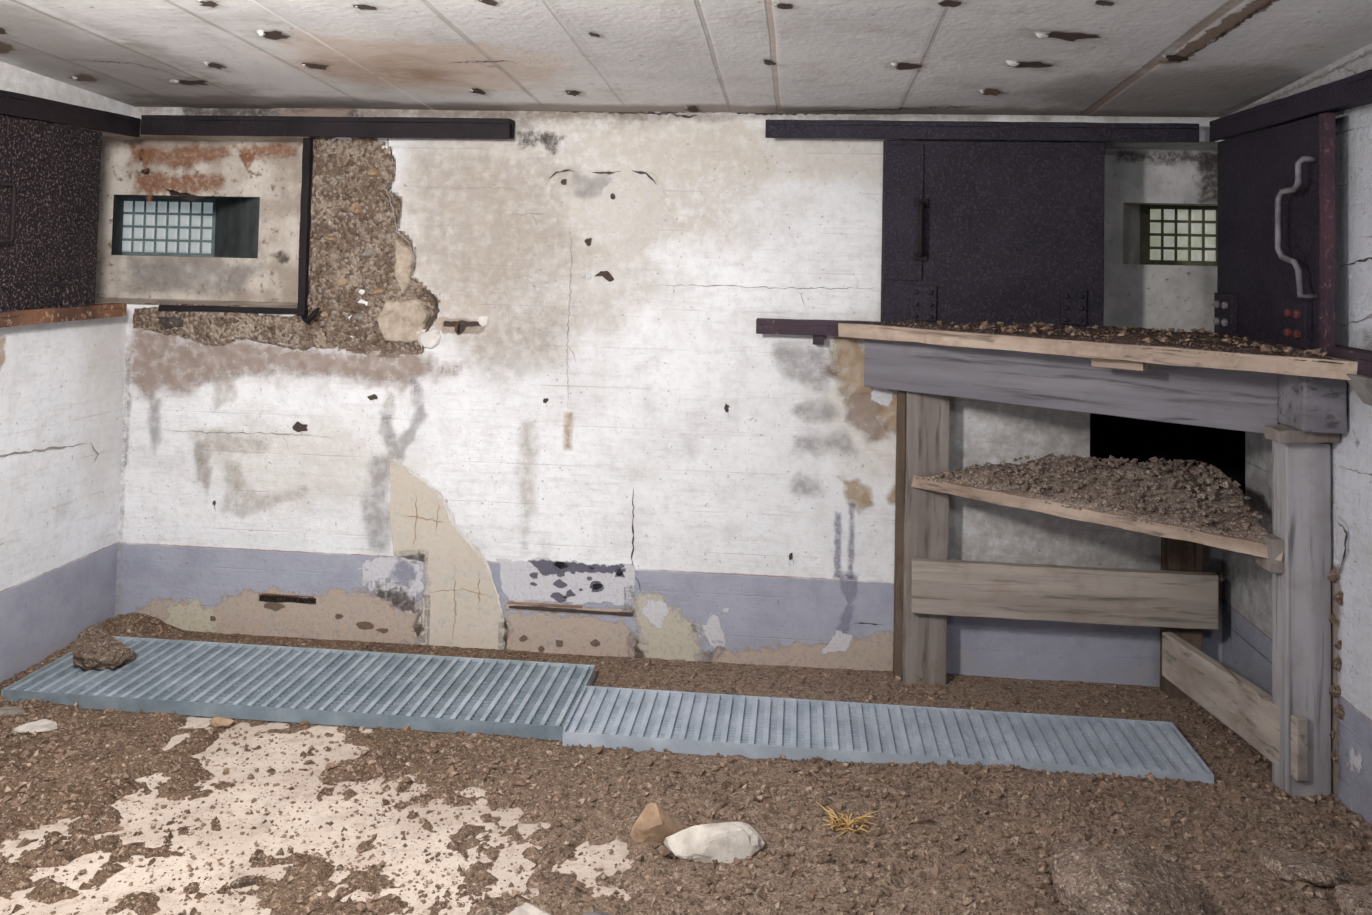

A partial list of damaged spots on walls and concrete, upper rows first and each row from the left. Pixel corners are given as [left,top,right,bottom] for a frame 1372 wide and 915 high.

rust [130,143,295,203]
flaking render [133,137,481,358]
crack [1340,257,1372,267]
crack [1343,314,1372,326]
crack [0,443,99,463]
flaking render [136,460,894,671]
peeling [1345,747,1363,772]